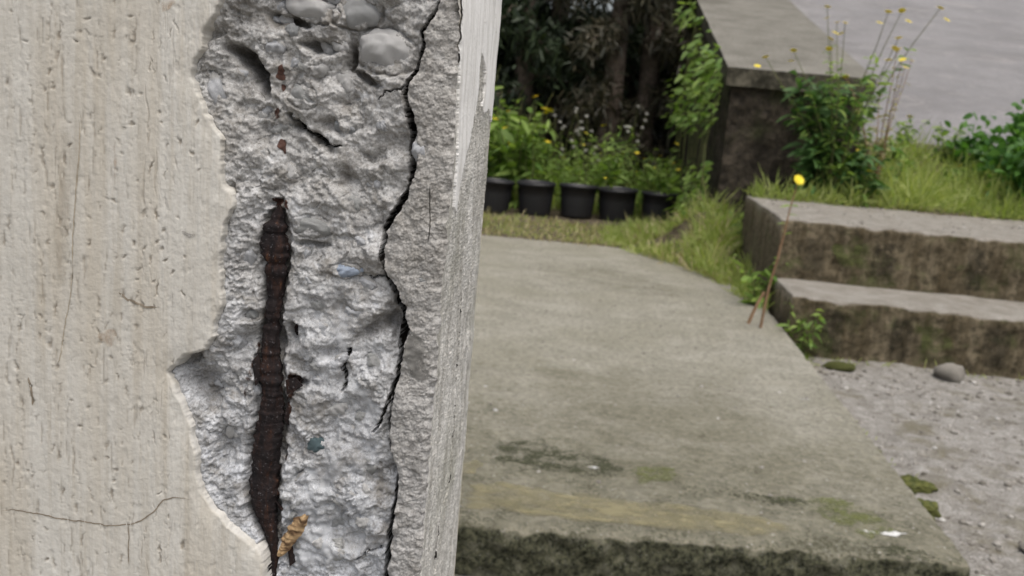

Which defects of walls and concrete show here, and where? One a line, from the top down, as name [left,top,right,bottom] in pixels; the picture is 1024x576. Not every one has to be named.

crack [3,497,185,563]
rust [276,64,286,91]
spalling [172,0,460,576]
crack [360,15,435,576]